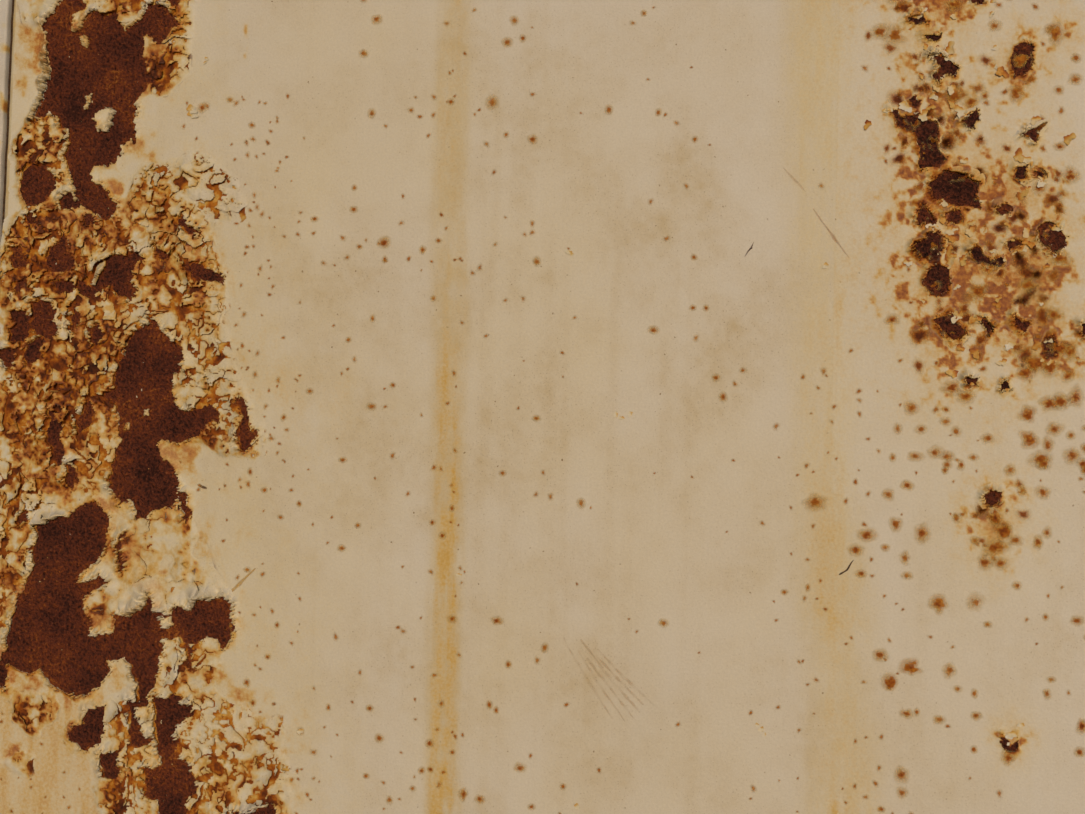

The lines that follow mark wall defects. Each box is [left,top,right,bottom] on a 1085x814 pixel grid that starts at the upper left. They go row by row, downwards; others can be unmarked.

peeling [16,0,51,40]
peeling [83,0,209,99]
spalling [864,0,1085,404]
peeling [0,104,271,647]
corrosion [0,0,395,814]
corrosion [407,0,496,814]
corrosion [822,0,1085,639]
peeling [0,674,53,782]
peeling [90,637,304,814]
corrosion [885,661,918,689]
spalling [994,723,1028,762]
corrosion [965,678,1063,796]